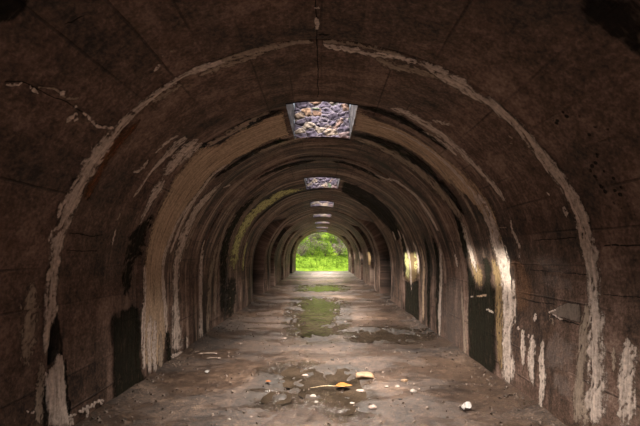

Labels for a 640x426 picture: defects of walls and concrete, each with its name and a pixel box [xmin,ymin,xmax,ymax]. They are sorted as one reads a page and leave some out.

crack [5,81,114,129]
leakage [20,40,314,426]
leakage [323,39,638,426]